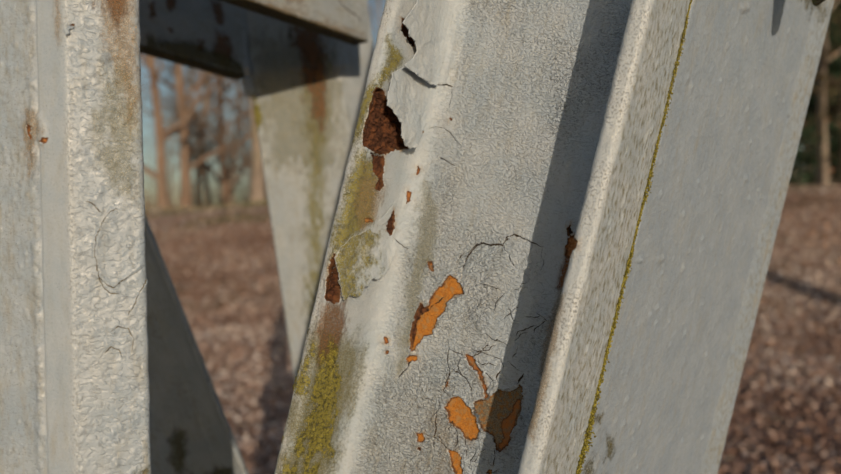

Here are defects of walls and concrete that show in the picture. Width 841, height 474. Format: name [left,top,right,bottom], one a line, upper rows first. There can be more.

corrosion [106,0,134,92]
peeling [352,0,455,191]
crack [86,201,147,357]
peeling [324,204,408,304]
peeling [398,261,470,378]
peeling [416,352,524,474]
crack [425,283,547,474]
crack [458,234,544,271]